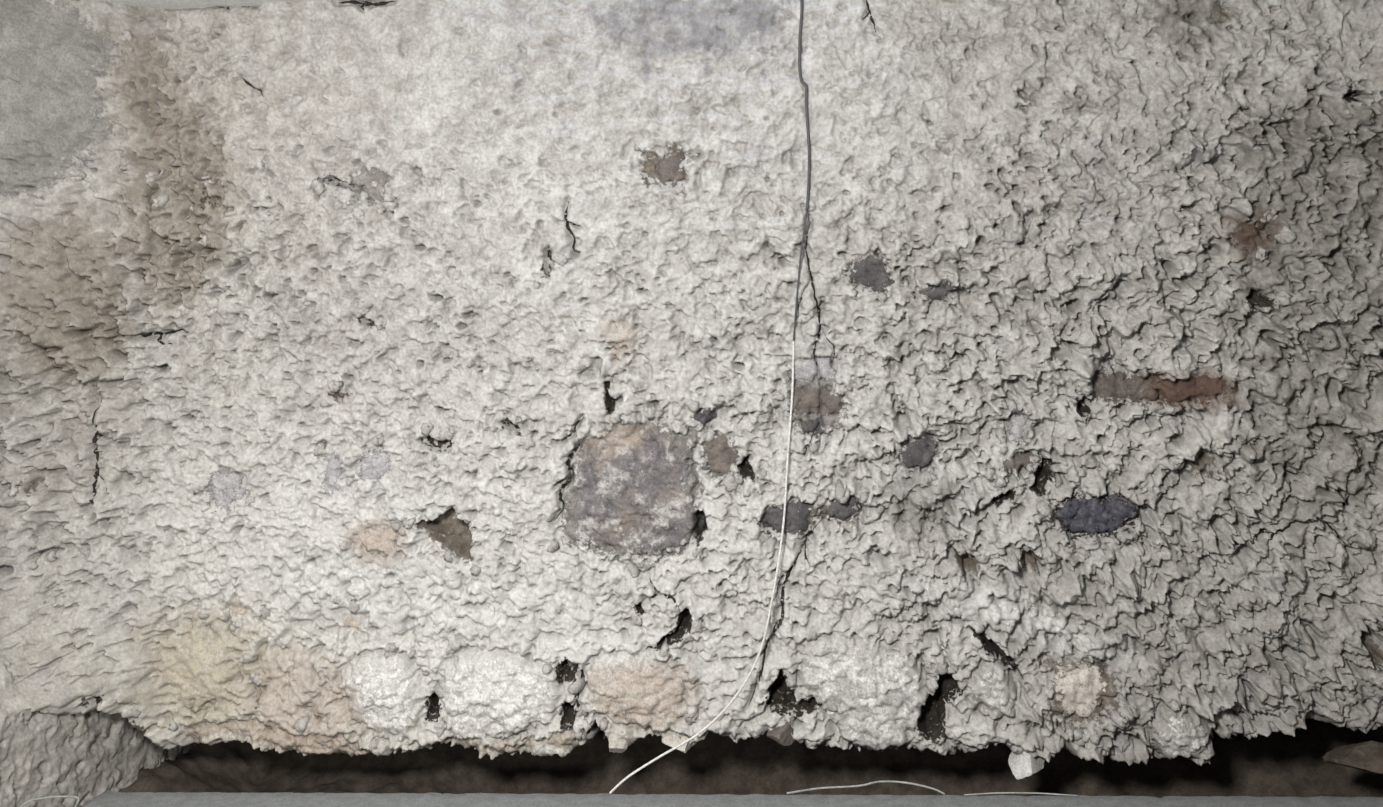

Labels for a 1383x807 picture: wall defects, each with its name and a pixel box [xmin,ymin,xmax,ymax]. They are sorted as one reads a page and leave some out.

spalling [634,141,701,198]
crack [564,201,579,252]
crack [798,204,835,387]
crack [89,399,107,503]
crack [555,417,584,520]
spalling [547,380,767,577]
spalling [985,396,1145,571]
spalling [339,506,481,575]
spalling [953,538,992,578]
crack [748,515,823,707]
hole [763,669,838,717]
hole [916,662,963,743]